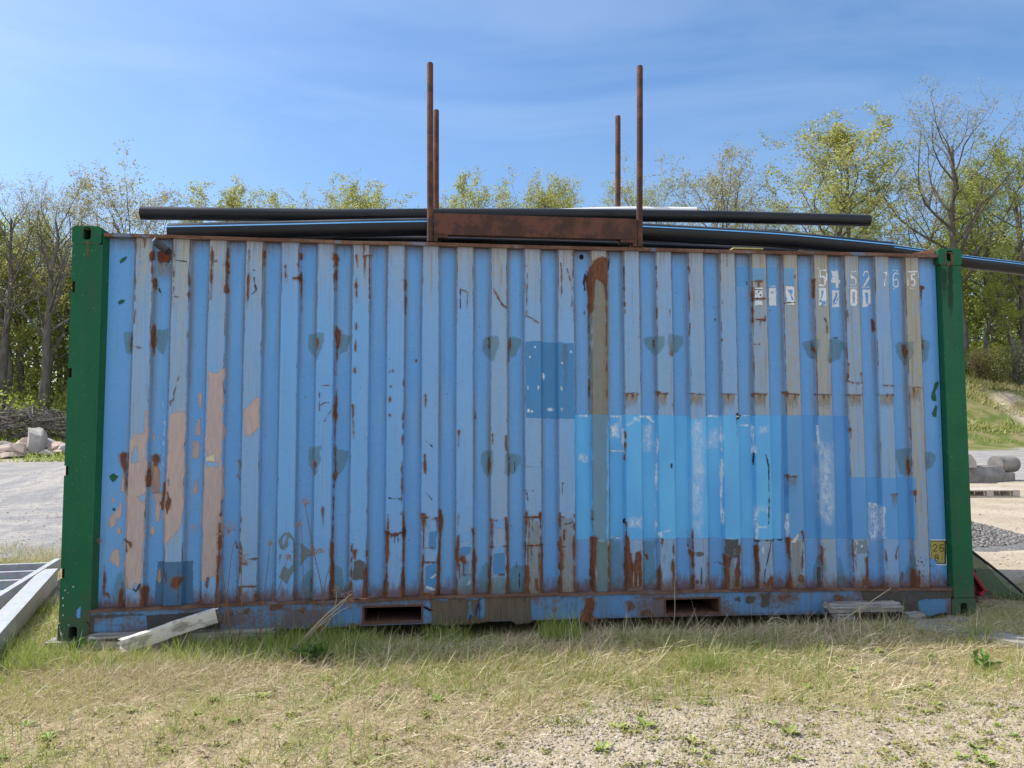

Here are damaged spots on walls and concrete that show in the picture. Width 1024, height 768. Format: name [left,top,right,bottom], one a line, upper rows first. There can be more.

rust [586,256,608,376]
peeling [244,398,261,436]
rust [145,454,171,513]
peeling [108,368,226,590]
rust [200,501,258,604]
rust [321,394,338,599]
rust [349,544,369,598]
rust [383,465,406,598]
rust [421,509,444,596]
rust [558,514,610,592]
rust [623,518,677,589]
rust [734,543,774,589]